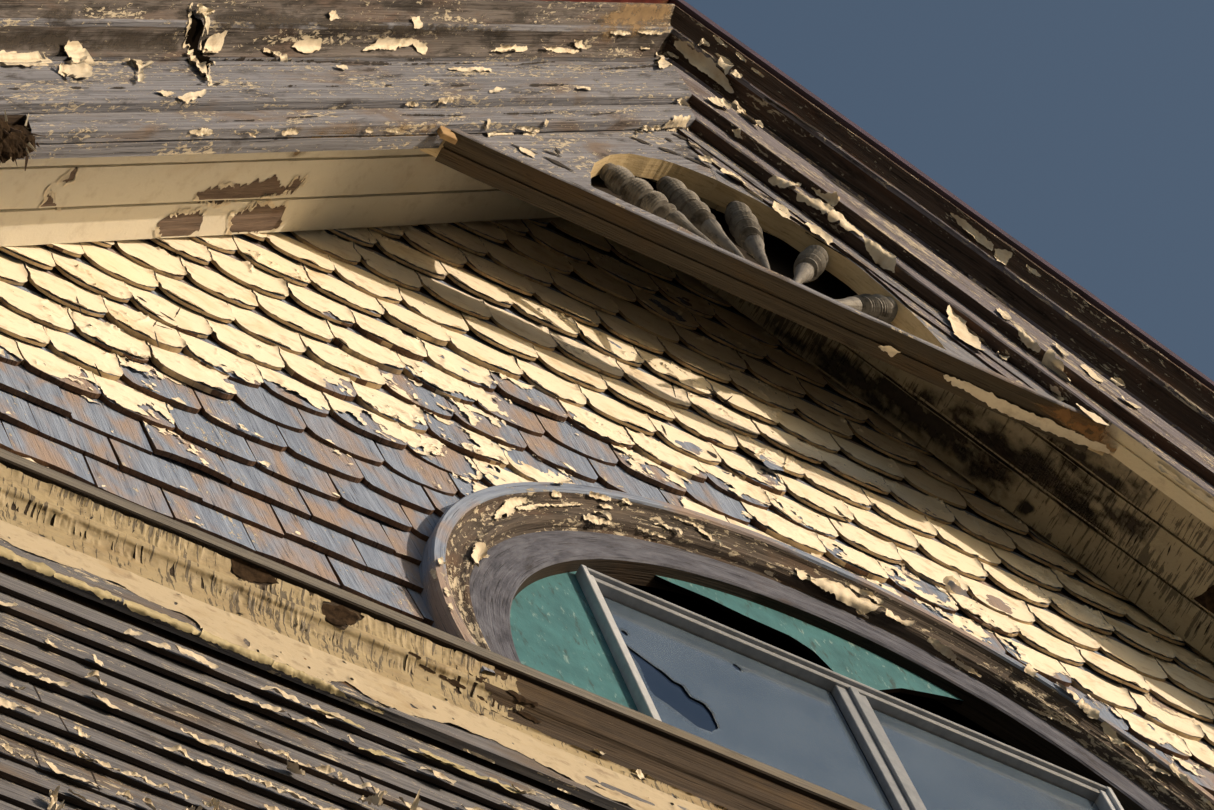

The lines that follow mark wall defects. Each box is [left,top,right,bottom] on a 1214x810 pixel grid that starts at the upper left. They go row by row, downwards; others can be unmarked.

peeling [0,40,95,78]
peeling [156,3,227,104]
peeling [263,38,322,62]
crack [183,2,474,116]
peeling [363,16,428,55]
crack [503,61,568,115]
crack [599,63,658,71]
peeling [611,30,764,139]
peeling [486,118,549,158]
crack [512,144,573,171]
peeling [698,155,896,273]
peeling [0,174,1214,810]